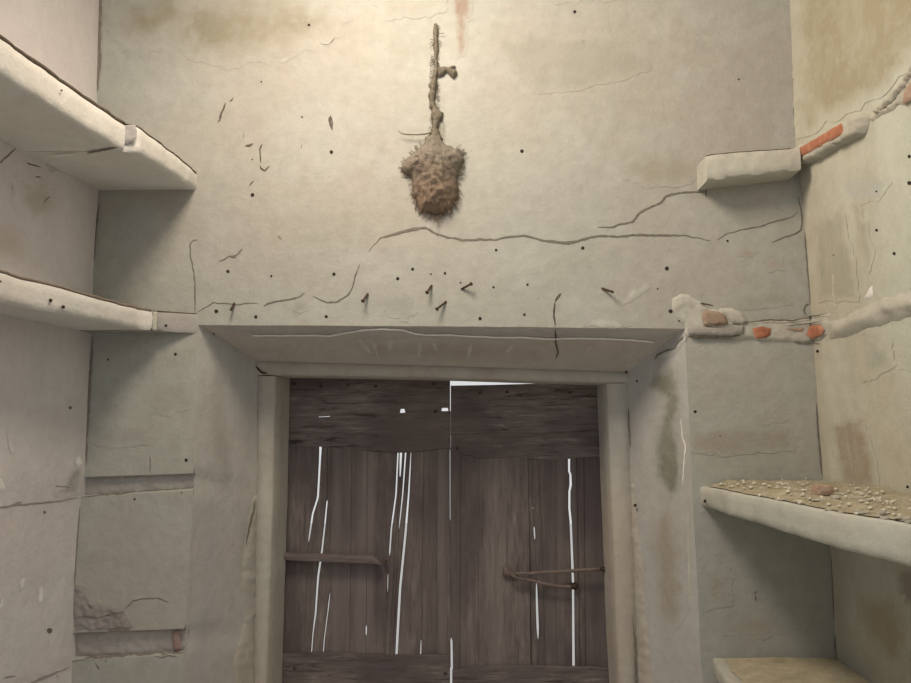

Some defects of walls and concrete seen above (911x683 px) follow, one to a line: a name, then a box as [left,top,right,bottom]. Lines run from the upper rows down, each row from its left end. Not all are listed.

rust [451,0,473,58]
spalling [793,66,911,165]
crack [189,191,810,315]
spalling [215,275,835,361]
crack [553,293,561,358]
crack [0,459,191,584]
water stain [647,363,794,637]
spalling [73,585,167,632]
crack [0,651,183,683]